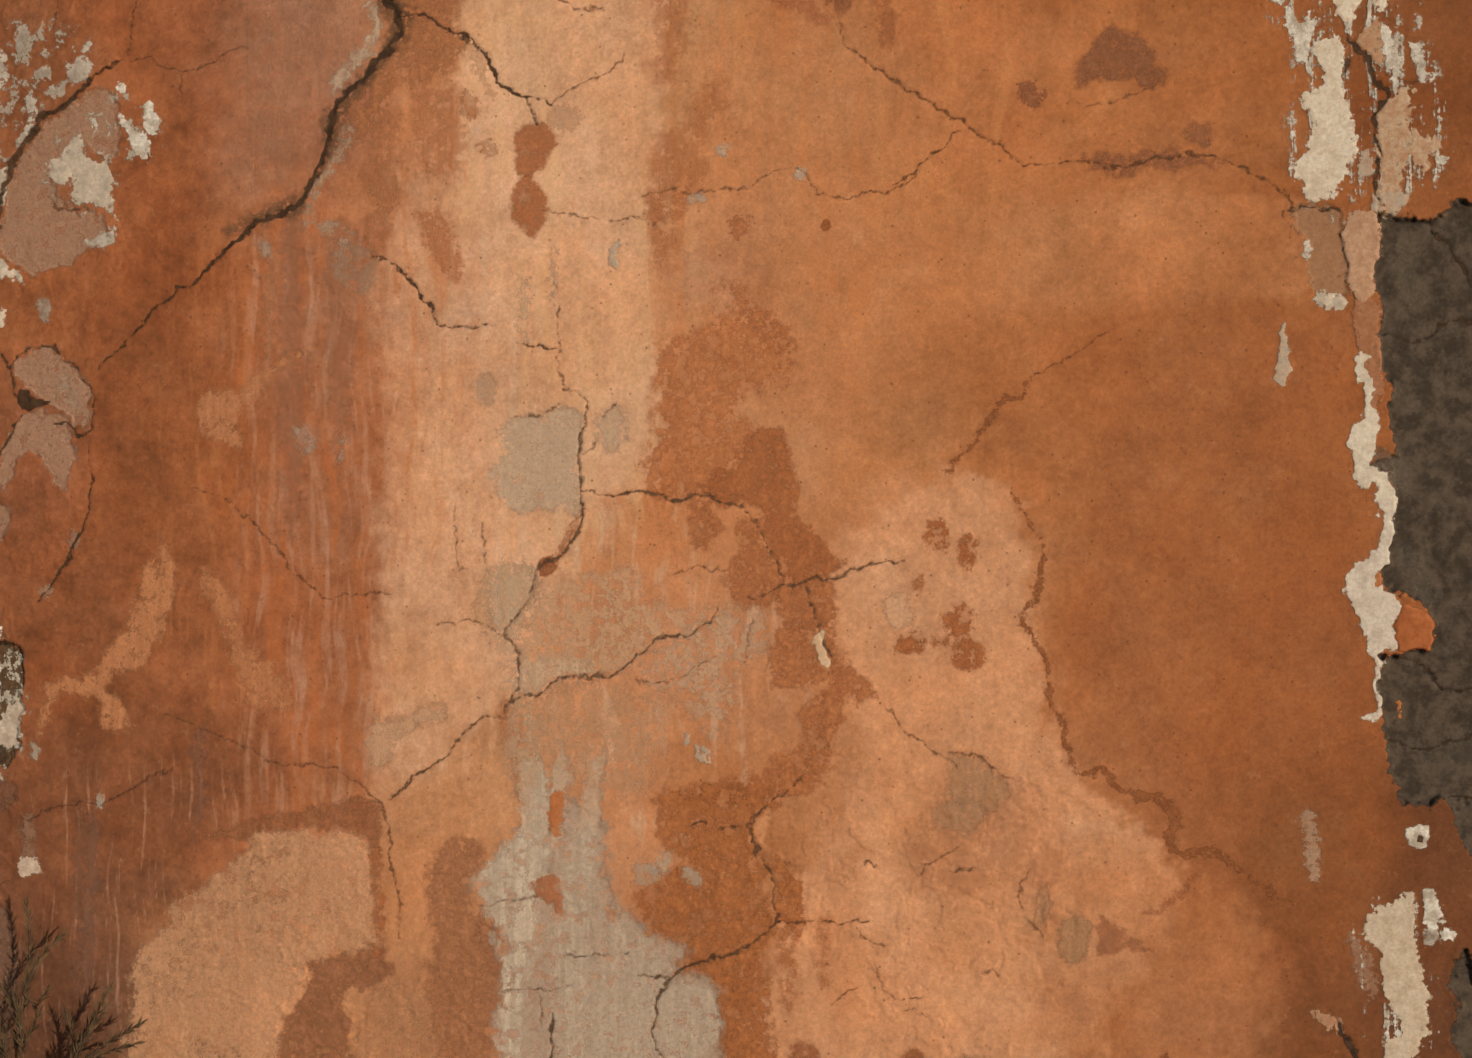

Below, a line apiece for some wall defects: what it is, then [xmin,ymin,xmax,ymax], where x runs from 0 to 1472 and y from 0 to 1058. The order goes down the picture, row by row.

peeling [0,345,92,541]
peeling [0,18,164,283]
crack [0,0,623,602]
water stain [512,122,558,237]
crack [669,24,1294,216]
flaking render [1266,0,1472,856]
flaking render [0,626,41,780]
crack [200,307,898,937]
crack [1011,492,1297,906]
peeling [17,814,42,877]
crack [568,777,884,1058]
peeling [1345,888,1472,1058]